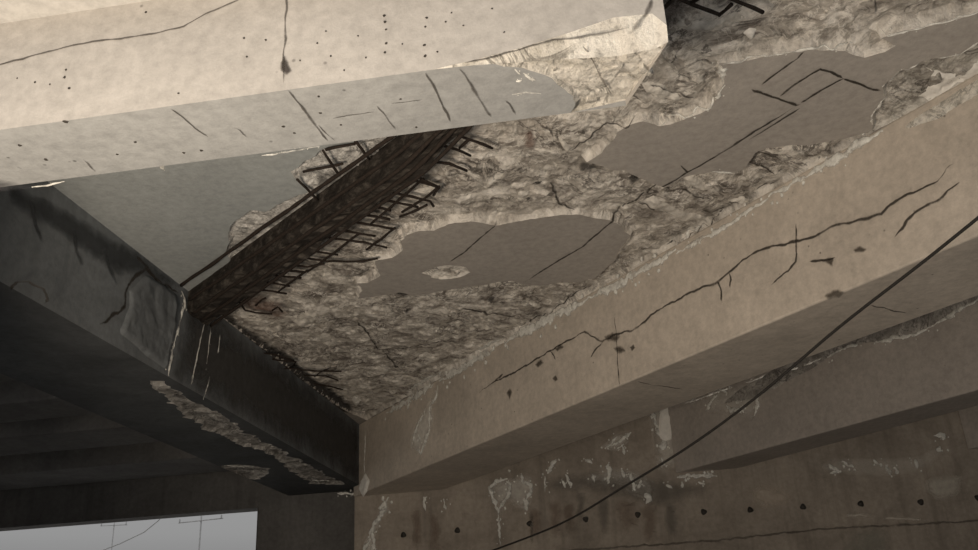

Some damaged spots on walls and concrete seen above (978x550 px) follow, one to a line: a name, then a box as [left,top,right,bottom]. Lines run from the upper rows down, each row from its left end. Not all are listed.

crack [0,0,237,65]
corrosion [664,0,765,17]
crack [533,53,879,277]
spalling [221,0,978,420]
crack [458,285,591,326]
crack [482,166,958,390]
spalling [150,381,345,485]
damp [650,408,672,467]
damp [363,496,393,550]
damp [488,459,560,545]
damp [581,458,652,504]
damp [663,470,717,488]